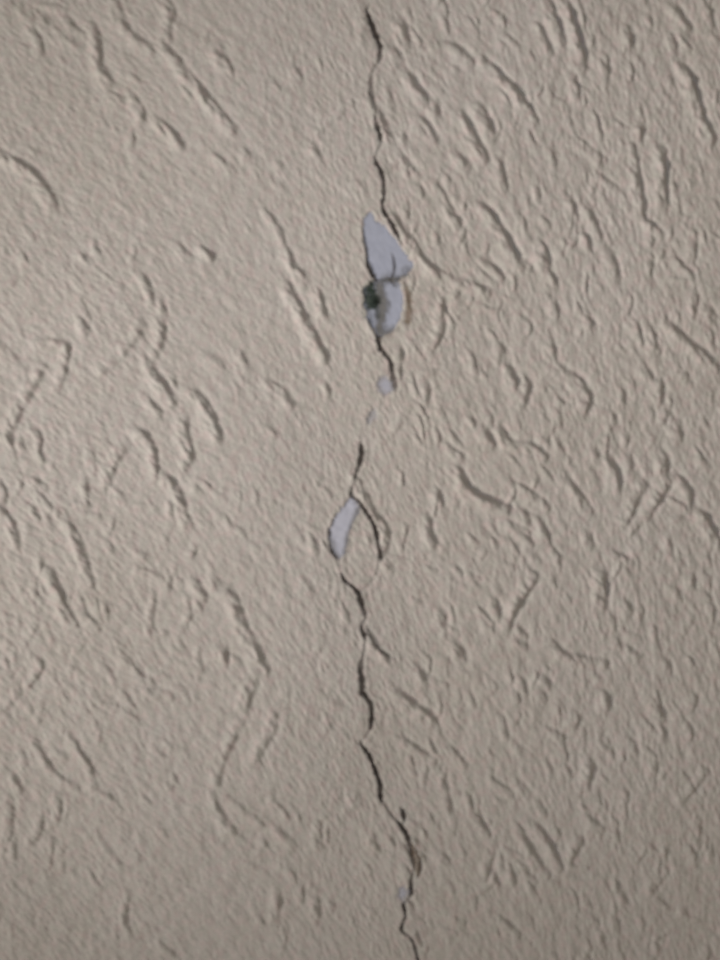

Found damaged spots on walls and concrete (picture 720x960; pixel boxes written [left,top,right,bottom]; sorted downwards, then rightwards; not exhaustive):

crack [366,10,383,57]
crack [364,119,400,281]
flaking render [363,212,414,340]
crack [377,335,396,387]
crack [357,444,365,468]
flaking render [321,498,360,559]
crack [351,491,383,559]
crack [329,530,421,960]